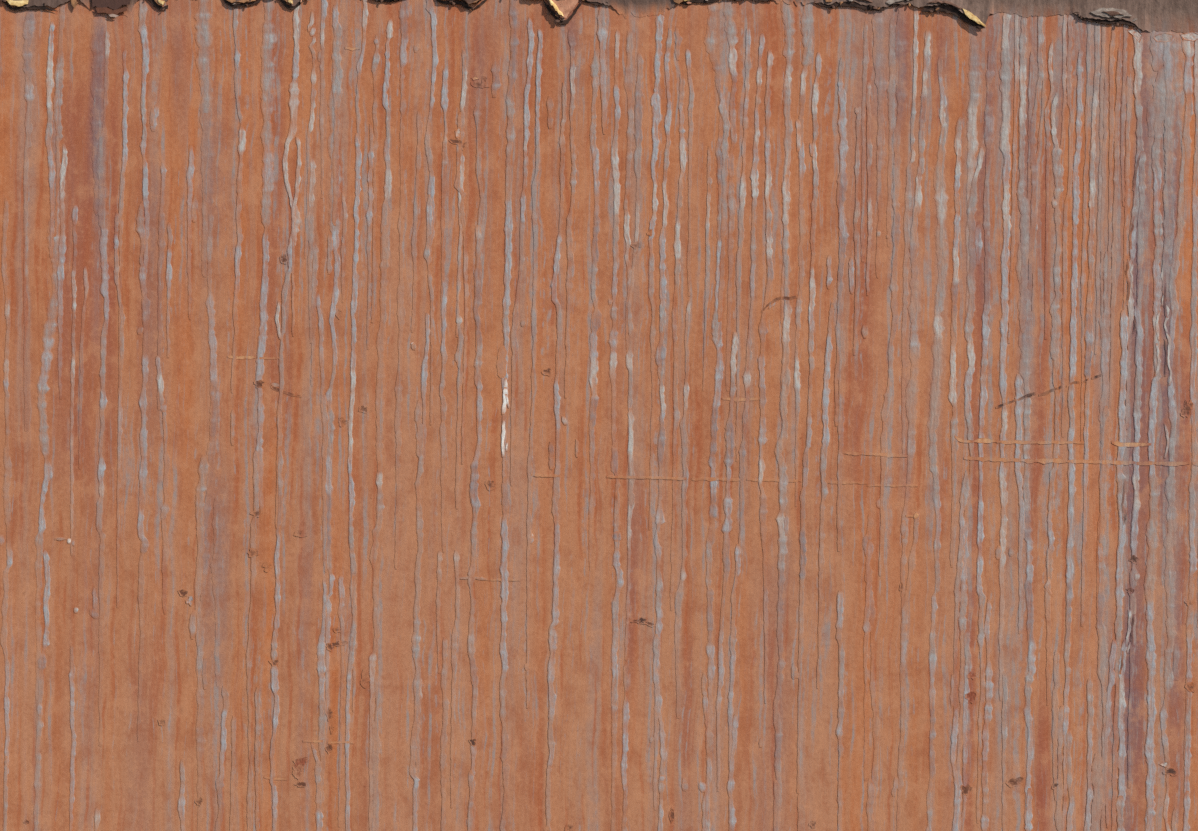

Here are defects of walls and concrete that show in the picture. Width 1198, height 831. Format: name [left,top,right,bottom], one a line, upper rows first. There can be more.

peeling [1,0,56,11]
peeling [149,0,168,11]
peeling [224,0,261,8]
peeling [437,0,487,11]
peeling [543,0,608,24]
peeling [814,0,986,29]
peeling [1075,8,1198,43]